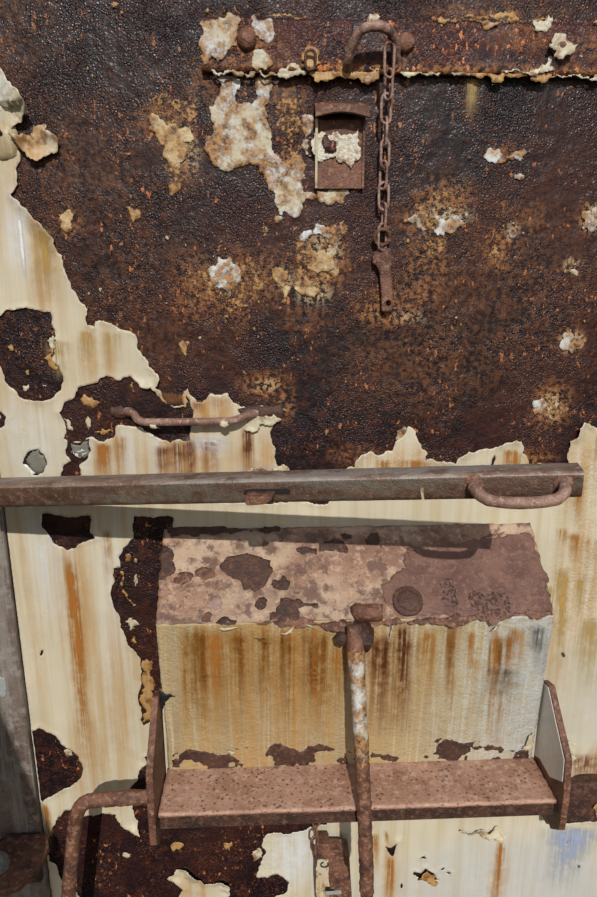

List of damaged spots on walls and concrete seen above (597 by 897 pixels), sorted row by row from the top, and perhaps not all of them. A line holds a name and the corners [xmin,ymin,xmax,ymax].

rust [322,134,338,153]
peeling [0,0,597,476]
rust [243,430,252,460]
rust [65,563,87,729]
rust [184,630,250,701]
peeling [111,516,353,725]
rust [371,628,435,702]
rust [488,630,522,694]
peeling [33,728,83,802]
peeling [130,756,147,789]
peeling [48,810,71,880]
peeling [76,805,327,897]